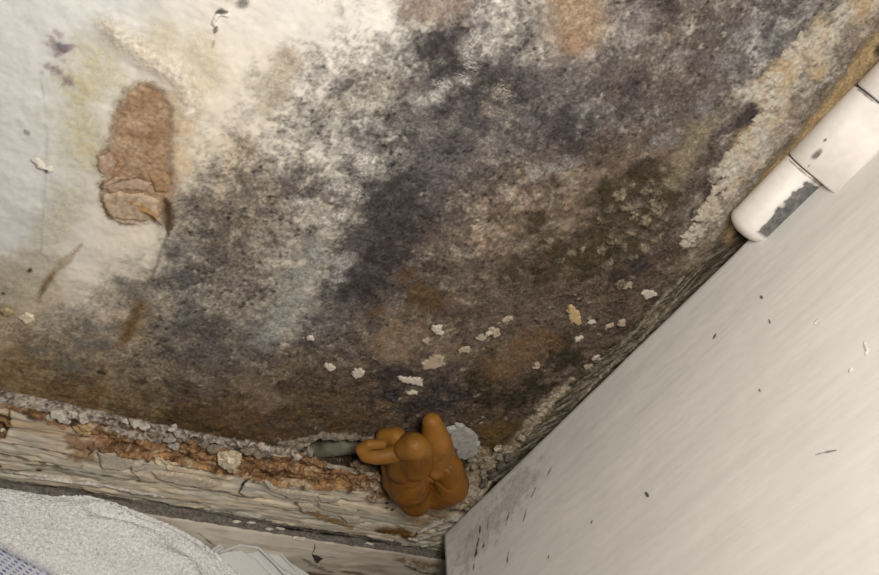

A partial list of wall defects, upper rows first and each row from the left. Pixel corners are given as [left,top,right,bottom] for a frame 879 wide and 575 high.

spalling [96,82,176,230]
leakage [0,0,879,456]
peeling [351,368,365,379]
peeling [397,354,446,395]
leakage [65,434,100,462]
peeling [97,451,145,472]
spalling [155,457,178,470]
spalling [0,389,376,467]
leakage [297,441,382,474]
peeling [0,465,366,575]